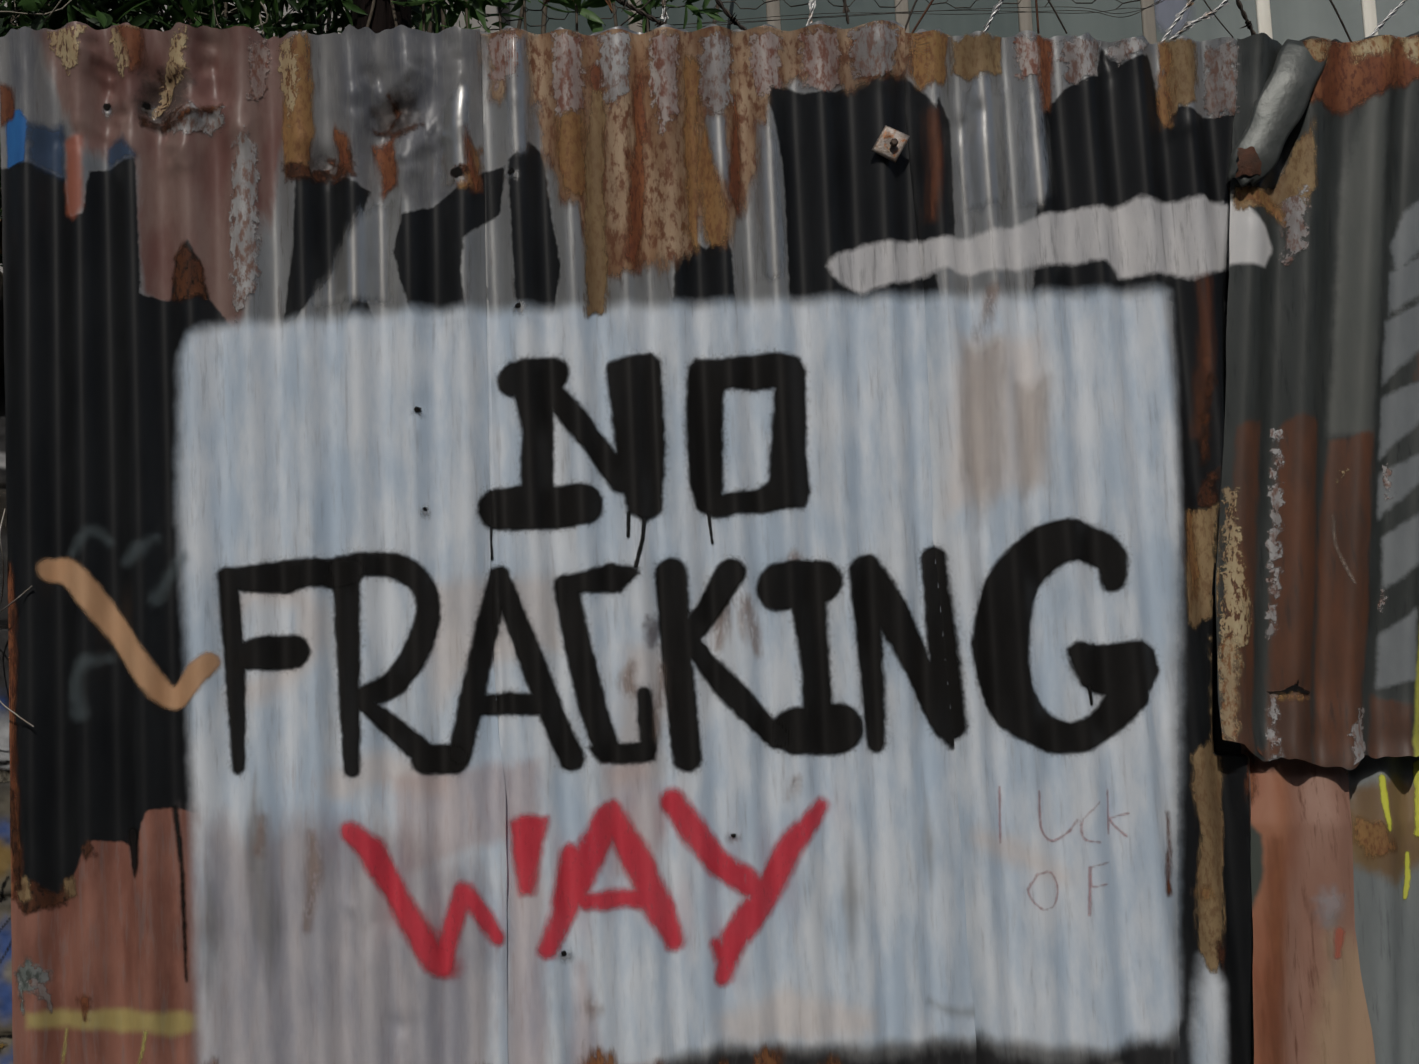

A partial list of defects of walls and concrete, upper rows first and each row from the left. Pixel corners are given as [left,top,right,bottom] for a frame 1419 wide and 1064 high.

rust [0,84,14,126]
rust [1037,34,1053,111]
rust [1157,41,1172,127]
rust [1304,35,1419,114]
rust [483,20,949,316]
rust [1229,124,1317,266]
rust [172,243,208,300]
rust [8,566,22,900]
peeling [1186,428,1286,973]
peeling [1344,707,1366,771]
rust [583,1048,617,1064]